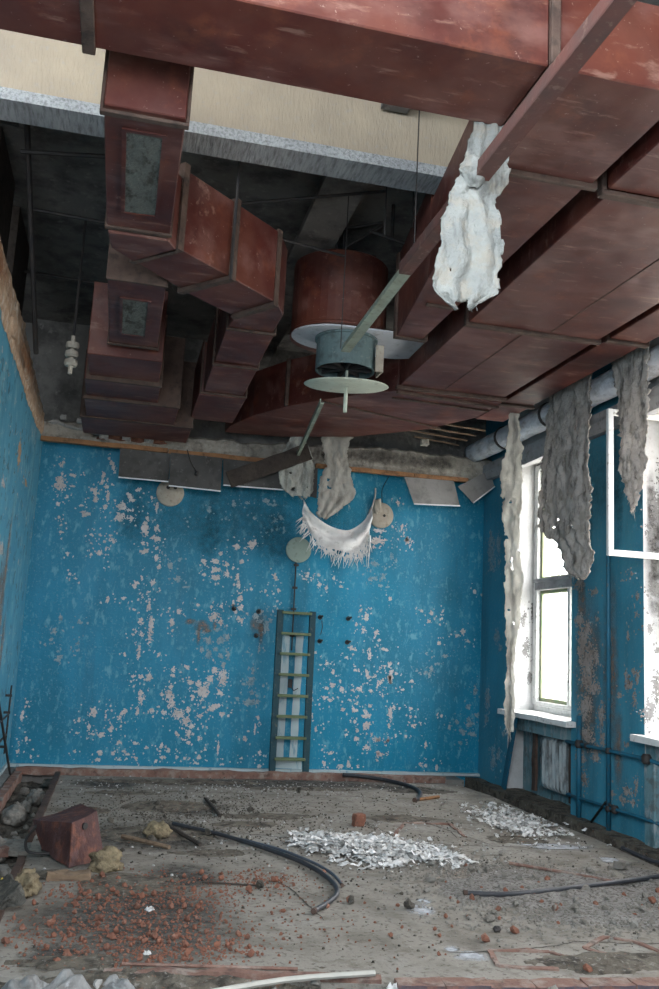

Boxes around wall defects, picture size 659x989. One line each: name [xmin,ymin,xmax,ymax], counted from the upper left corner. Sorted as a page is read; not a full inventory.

spalling [0,237,167,445]
peeling [12,698,39,761]
peeling [40,613,89,666]
peeling [51,453,286,768]
peeling [299,569,348,601]
peeling [362,524,414,601]
peeling [311,605,506,778]
water stain [578,581,621,774]
water stain [648,488,659,613]